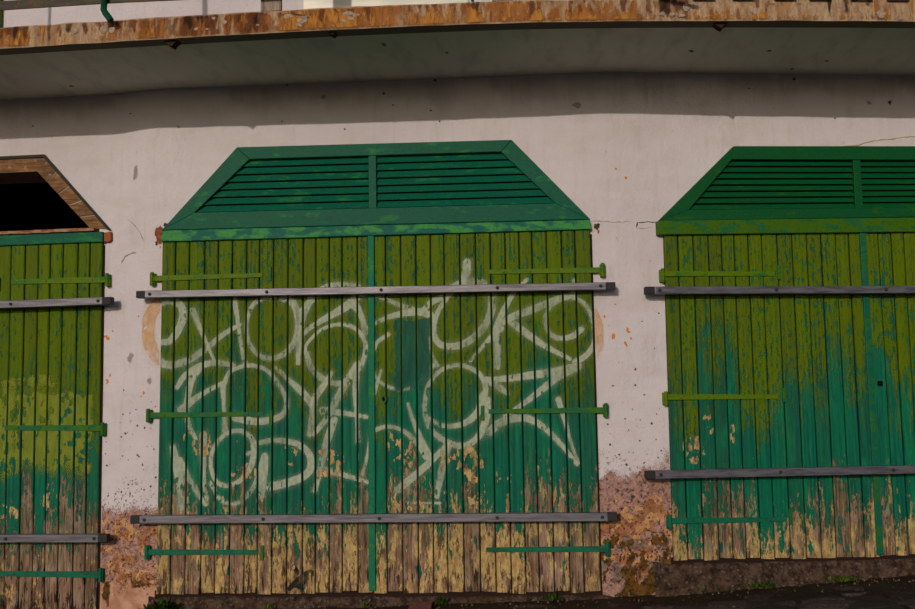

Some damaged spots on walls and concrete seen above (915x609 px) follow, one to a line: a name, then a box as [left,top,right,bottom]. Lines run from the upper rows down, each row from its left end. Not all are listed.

corrosion [710,0,816,19]
corrosion [98,0,699,40]
corrosion [0,26,30,46]
corrosion [40,24,71,42]
crack [848,136,915,146]